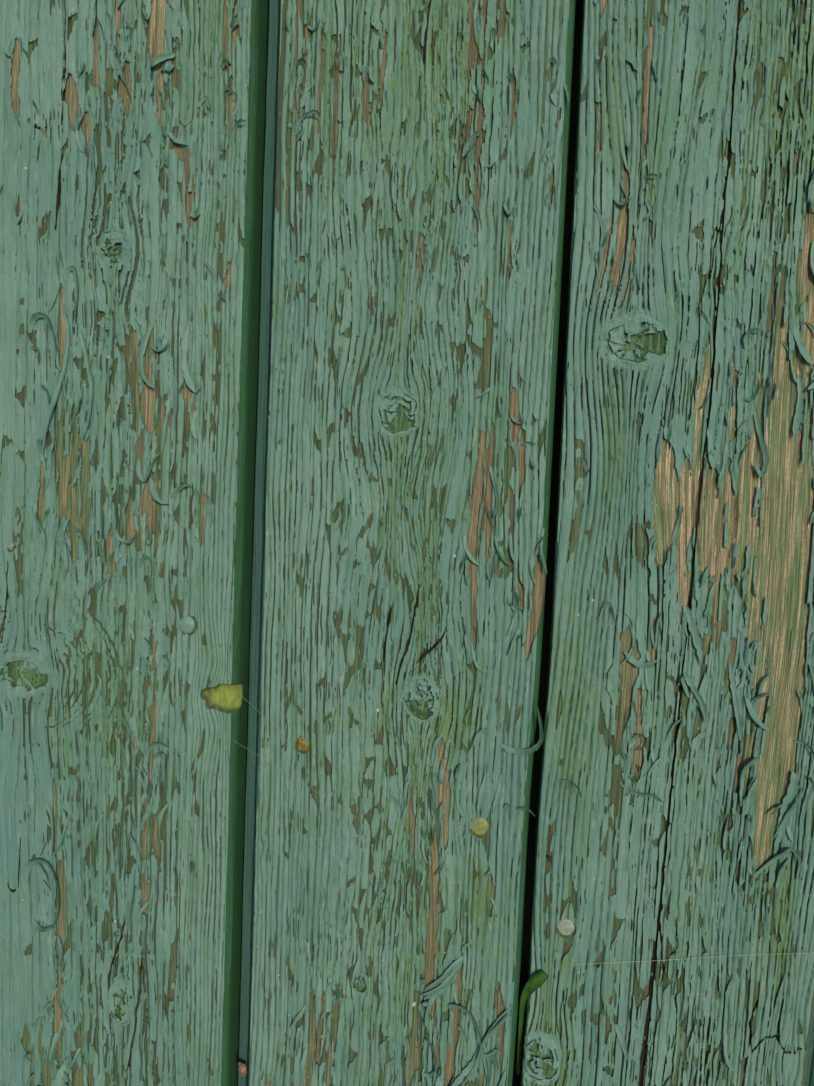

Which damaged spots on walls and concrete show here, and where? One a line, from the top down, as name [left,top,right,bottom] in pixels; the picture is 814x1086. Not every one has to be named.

peeling [144,0,200,242]
peeling [286,0,349,198]
peeling [454,0,497,247]
peeling [594,15,663,303]
peeling [28,248,213,926]
peeling [460,415,549,673]
peeling [607,601,664,805]
crack [638,0,740,1086]
peeling [650,241,814,888]
peeling [23,781,88,1086]
peeling [392,735,535,1086]
crack [749,999,807,1053]